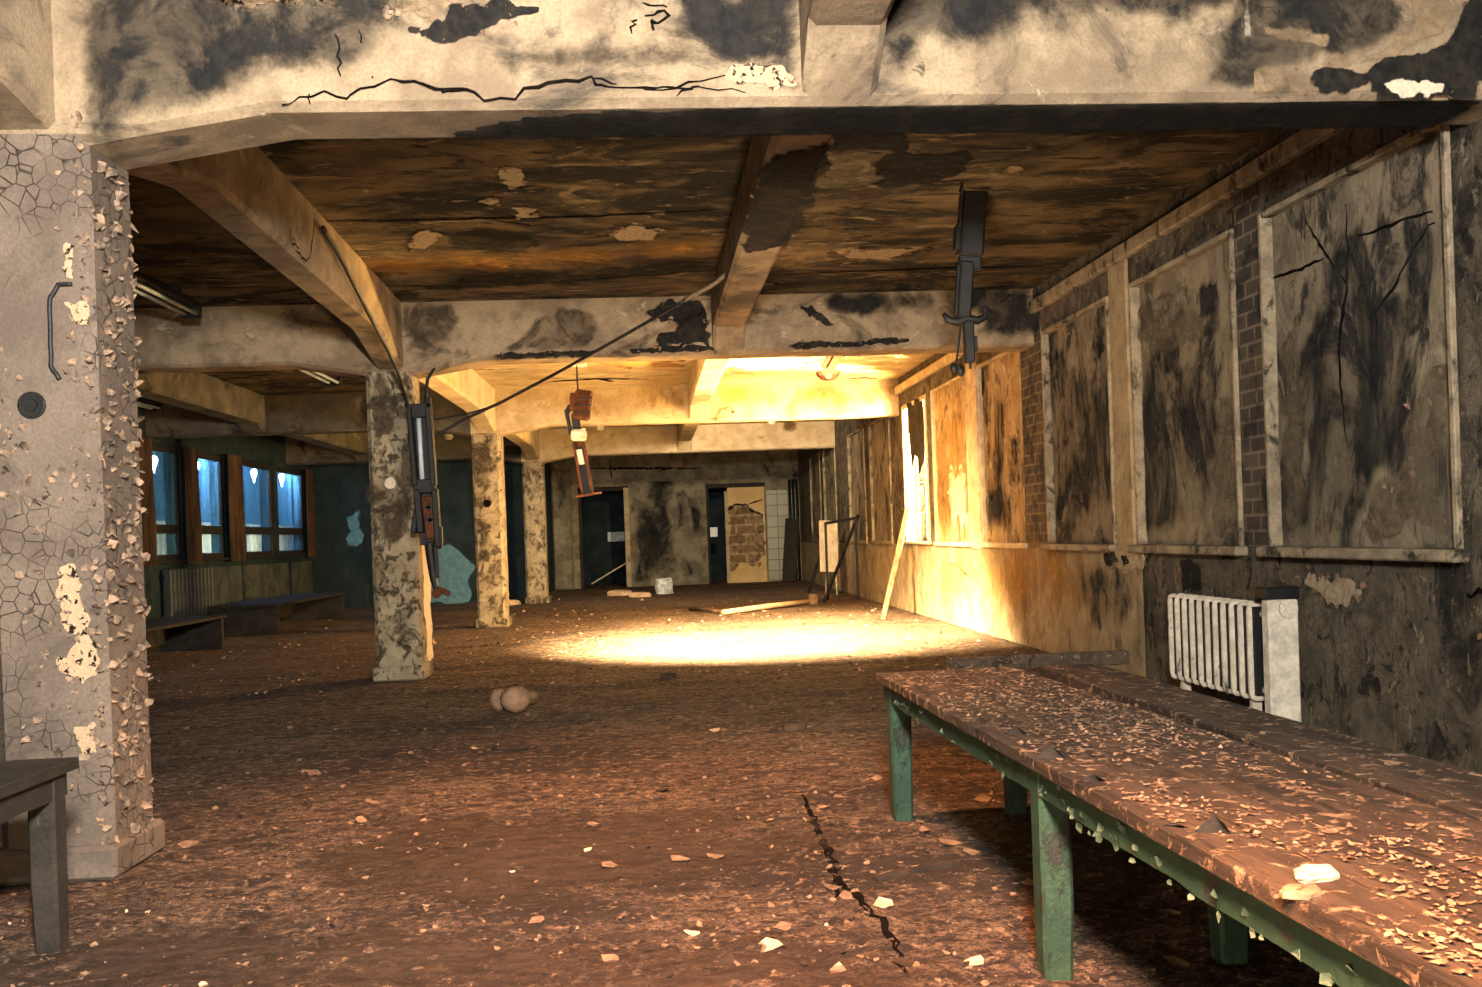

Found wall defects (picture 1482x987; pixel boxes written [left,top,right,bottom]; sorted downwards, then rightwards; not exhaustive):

crack [282,29,745,105]
water stain [1254,68,1306,92]
water stain [1244,0,1353,69]
water stain [1370,0,1456,59]
spalling [453,0,1482,264]
peeling [407,230,443,253]
water stain [1142,282,1219,532]
water stain [1299,218,1430,525]
peeling [0,111,158,845]
spalling [728,503,766,571]
crack [801,794,910,977]